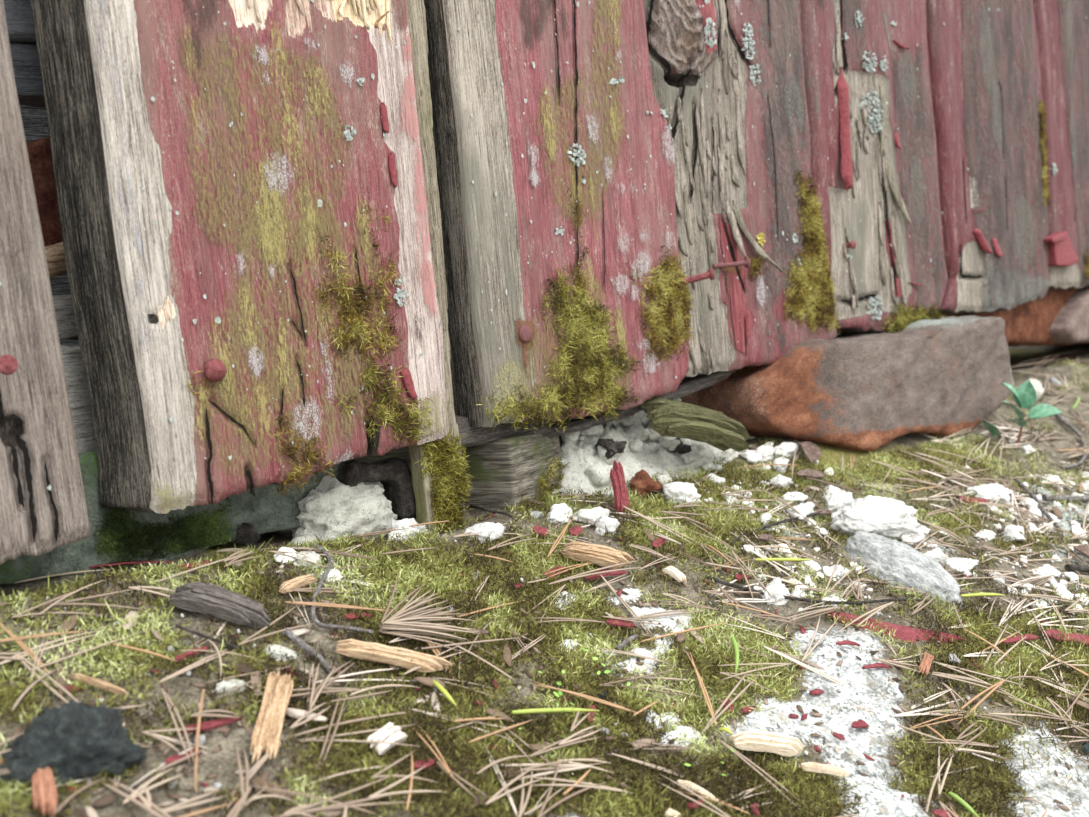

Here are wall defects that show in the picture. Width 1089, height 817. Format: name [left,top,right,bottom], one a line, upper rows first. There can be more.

crack [280,264,306,431]
peeling [368,0,446,445]
crack [554,0,605,292]
peeling [644,0,783,377]
peeling [829,0,924,320]
peeling [969,176,985,212]
peeling [955,228,1003,312]
peeling [1049,264,1084,289]
crack [0,394,59,544]
crack [205,401,255,504]